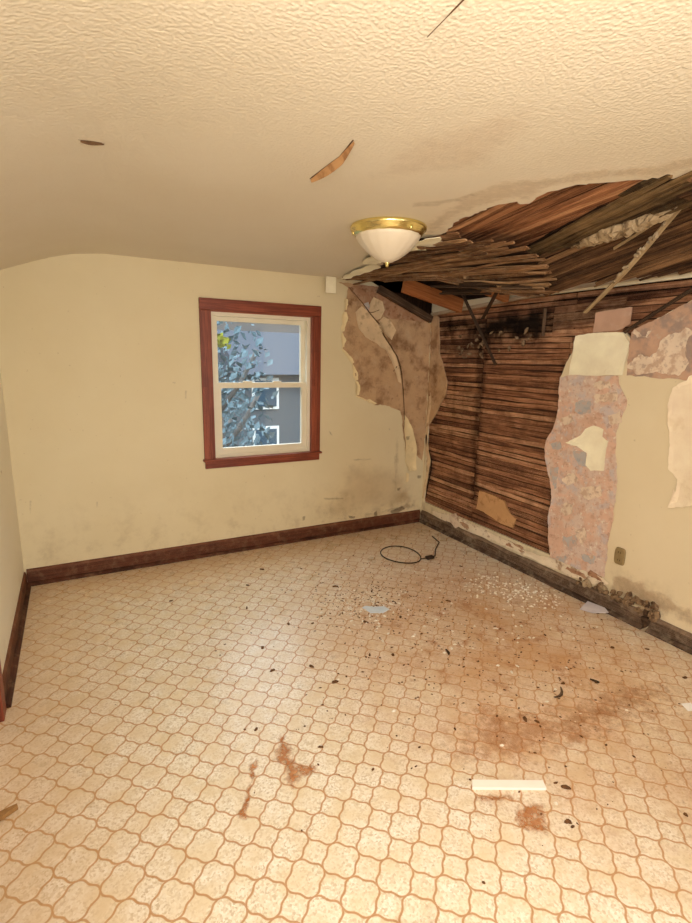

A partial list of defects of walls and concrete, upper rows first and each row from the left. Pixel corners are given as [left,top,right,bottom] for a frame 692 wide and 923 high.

crack [427,0,464,37]
flaking render [339,280,692,628]